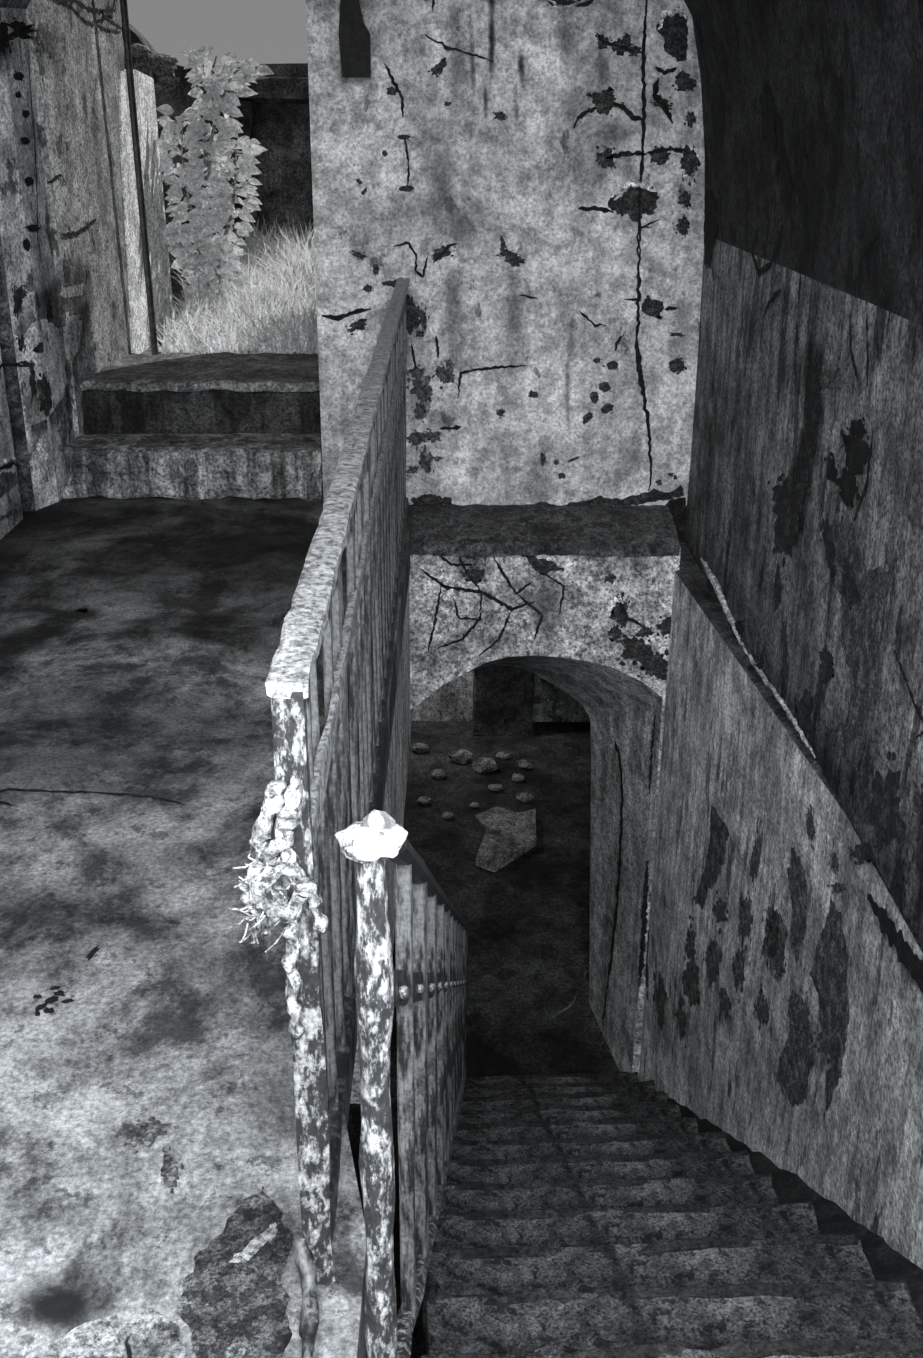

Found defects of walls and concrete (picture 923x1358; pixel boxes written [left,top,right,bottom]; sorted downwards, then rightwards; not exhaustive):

spalling [537,0,594,8]
peeling [595,32,642,57]
peeling [650,6,699,128]
peeling [574,86,718,277]
crack [634,0,652,491]
peeling [0,471,21,521]
crack [420,556,565,656]
peeling [458,535,564,584]
peeling [604,572,671,680]
peeling [767,473,810,620]
peeling [645,513,923,1119]
crack [124,1336,132,1358]